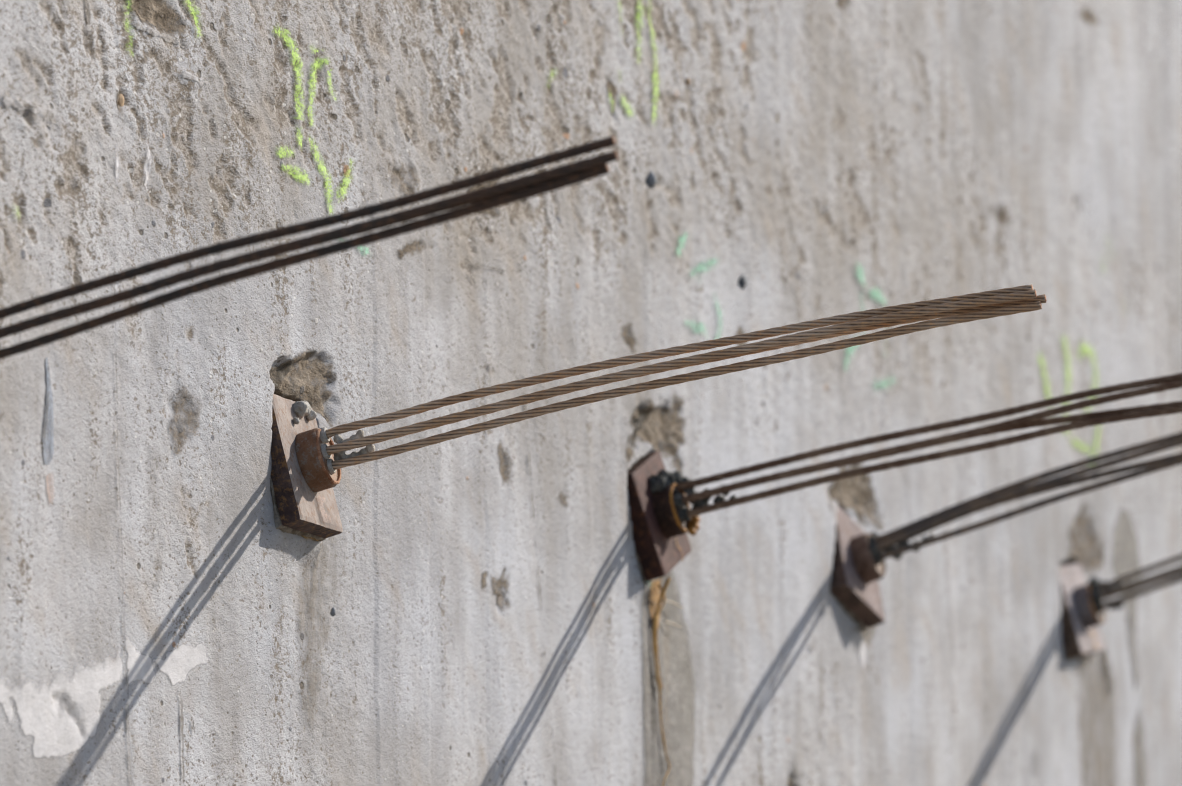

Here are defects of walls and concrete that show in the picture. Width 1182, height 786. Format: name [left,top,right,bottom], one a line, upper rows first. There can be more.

spalling [269,351,336,426]
spalling [626,395,685,475]
spalling [828,464,883,530]
peeling [0,637,208,758]
damp [642,572,695,786]